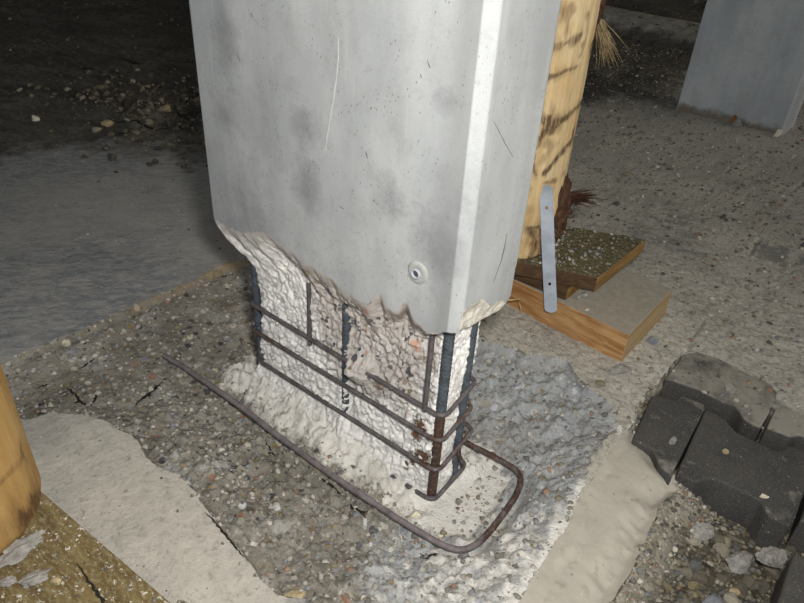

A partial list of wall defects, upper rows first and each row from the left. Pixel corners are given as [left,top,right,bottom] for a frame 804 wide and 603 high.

crack [136,378,166,406]
spalling [0,219,622,603]
rust [401,414,433,471]